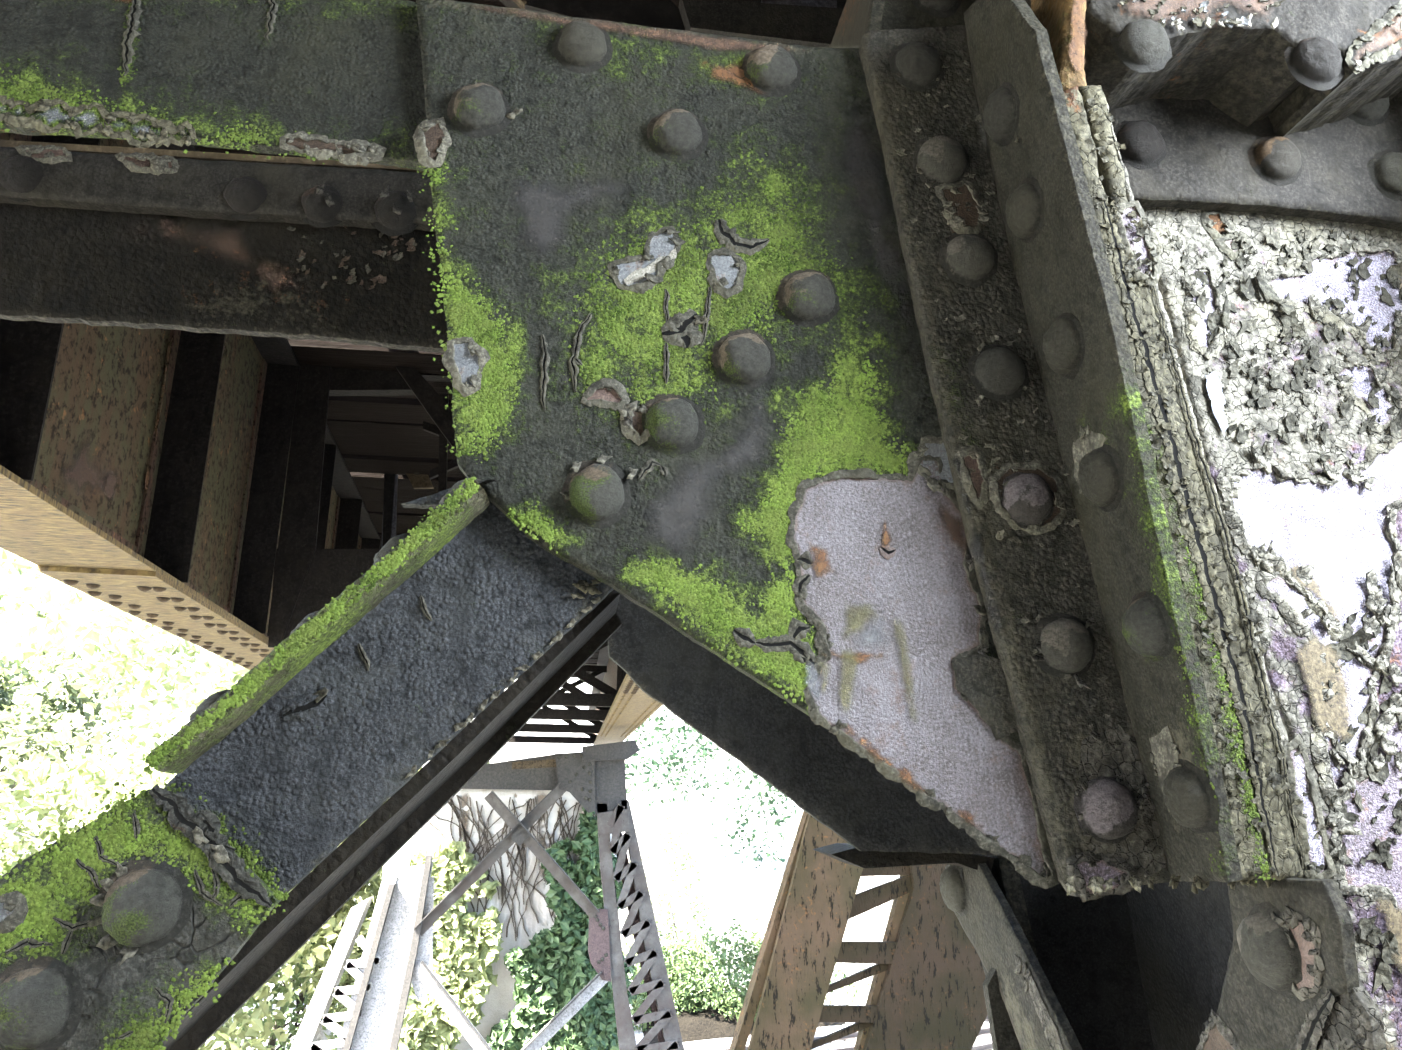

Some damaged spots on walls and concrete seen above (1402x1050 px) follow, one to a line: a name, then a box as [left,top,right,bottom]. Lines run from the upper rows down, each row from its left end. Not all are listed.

rust [1129,0,1274,21]
peeling [0,95,197,176]
peeling [895,120,995,252]
peeling [607,226,686,294]
peeling [706,247,747,299]
peeling [785,269,1210,902]
crack [5,784,273,955]
crack [118,987,174,1040]
peeling [1014,954,1063,1050]
peeling [1196,1009,1241,1050]